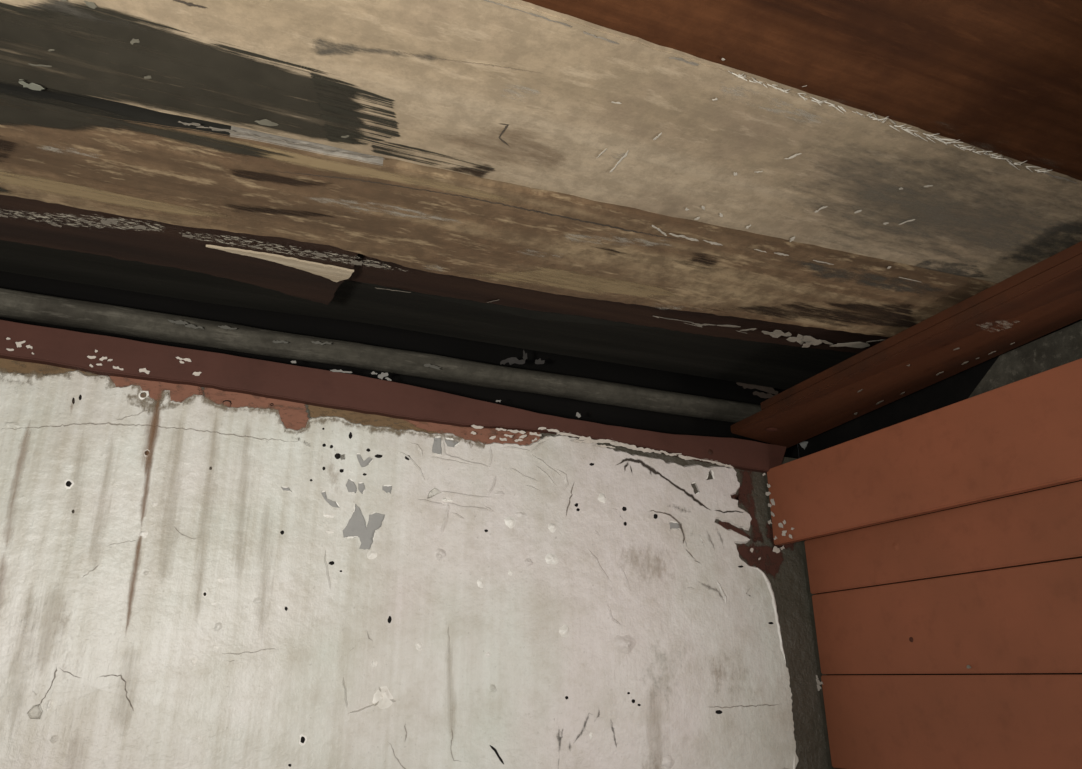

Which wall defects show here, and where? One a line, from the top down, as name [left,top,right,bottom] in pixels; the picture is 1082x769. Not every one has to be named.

water stain [0,0,494,178]
water stain [230,169,333,186]
peeling [500,350,545,365]
peeling [654,316,884,348]
corrosion [142,402,159,518]
peeling [357,453,373,467]
peeling [432,436,459,455]
peeling [496,427,734,494]
peeling [343,479,385,550]
crack [617,458,743,557]
peeling [763,473,794,553]
corrosion [127,537,141,625]